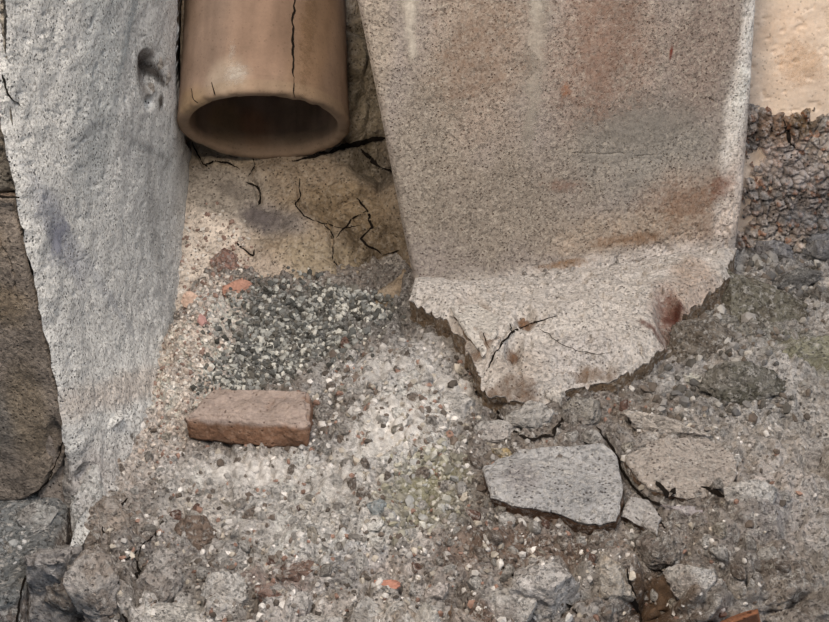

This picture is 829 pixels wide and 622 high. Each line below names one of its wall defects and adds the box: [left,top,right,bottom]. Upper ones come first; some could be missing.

crack [289,0,297,97]
crack [192,142,261,205]
crack [292,136,399,265]
flaking render [450,303,500,361]
crack [467,316,610,372]
spalling [664,302,683,325]
crack [28,442,63,497]
crack [16,575,26,622]